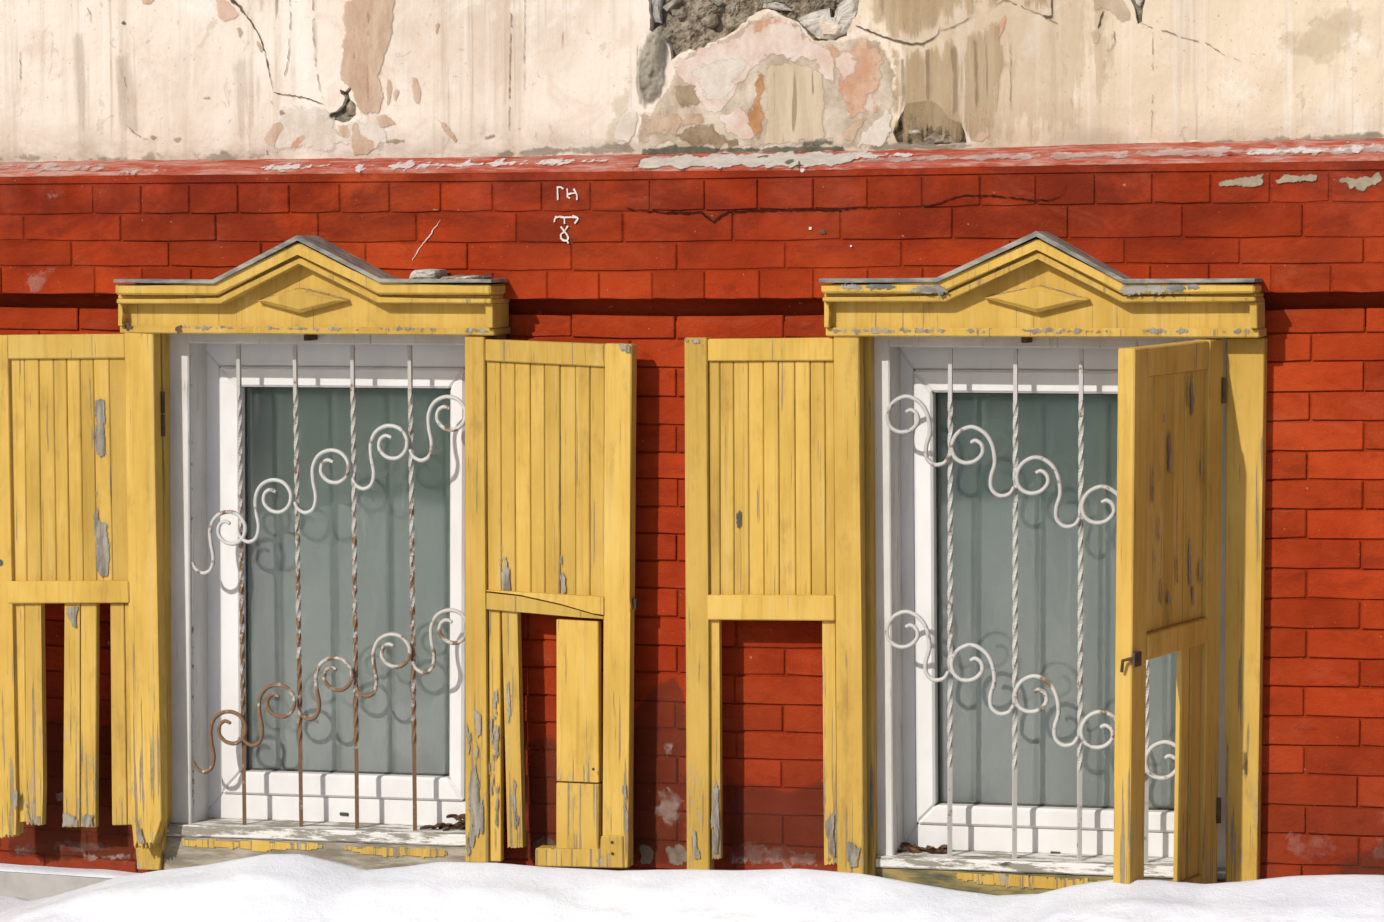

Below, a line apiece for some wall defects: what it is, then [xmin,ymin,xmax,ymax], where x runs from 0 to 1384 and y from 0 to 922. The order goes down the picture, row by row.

crack [230,0,324,104]
peeling [262,0,608,172]
peeling [614,0,1384,172]
peeling [1219,174,1317,187]
peeling [1334,173,1382,191]
peeling [93,492,110,577]
peeling [67,606,78,628]
peeling [12,789,40,825]
peeling [62,812,93,827]
peeling [956,872,1111,889]